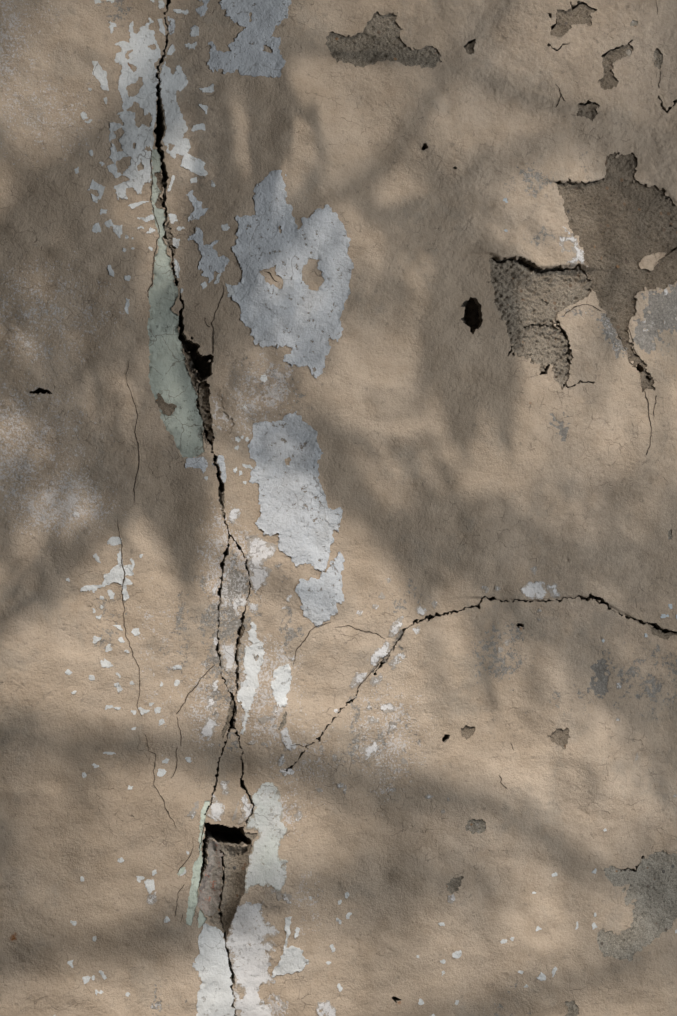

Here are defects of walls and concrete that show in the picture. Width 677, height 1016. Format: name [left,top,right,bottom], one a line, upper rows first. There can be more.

spalling [325,12,442,69]
spalling [547,1,595,51]
spalling [598,41,634,90]
crack [126,361,140,502]
crack [147,36,247,606]
peeling [80,0,354,776]
spalling [461,299,480,332]
spalling [488,153,677,392]
crack [117,519,253,827]
crack [286,595,676,770]
crack [218,912,236,1016]
peeling [177,776,309,1016]